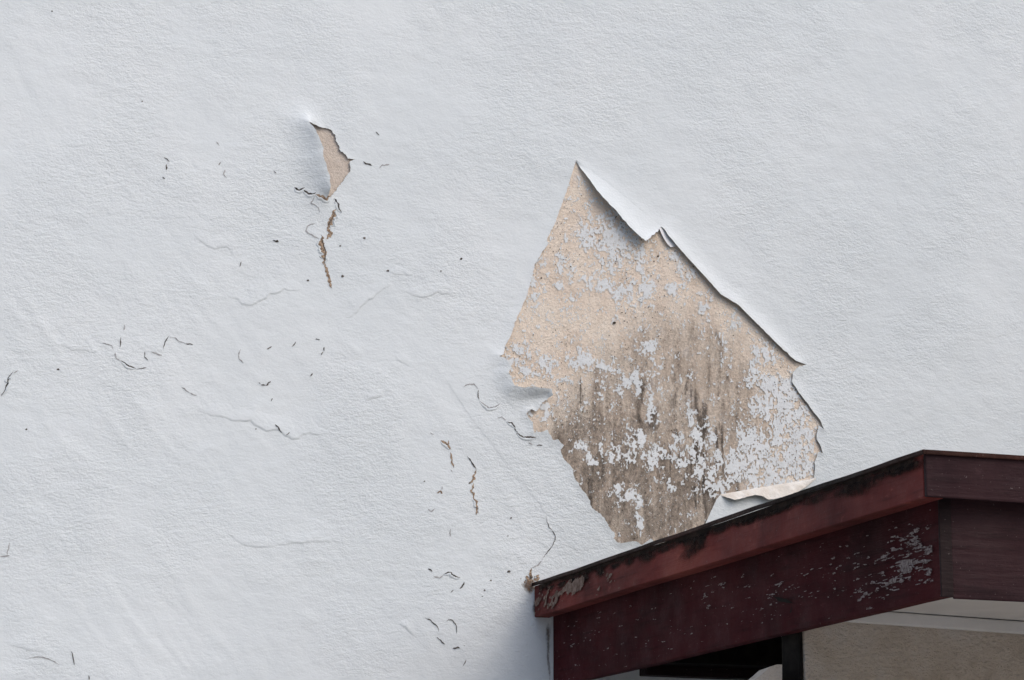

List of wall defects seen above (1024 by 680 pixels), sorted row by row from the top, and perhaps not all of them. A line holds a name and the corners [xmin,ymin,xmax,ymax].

crack [274,171,342,288]
peeling [310,122,354,198]
peeling [501,161,823,545]
crack [428,366,556,577]
leakage [547,383,731,590]
spalling [701,524,933,623]